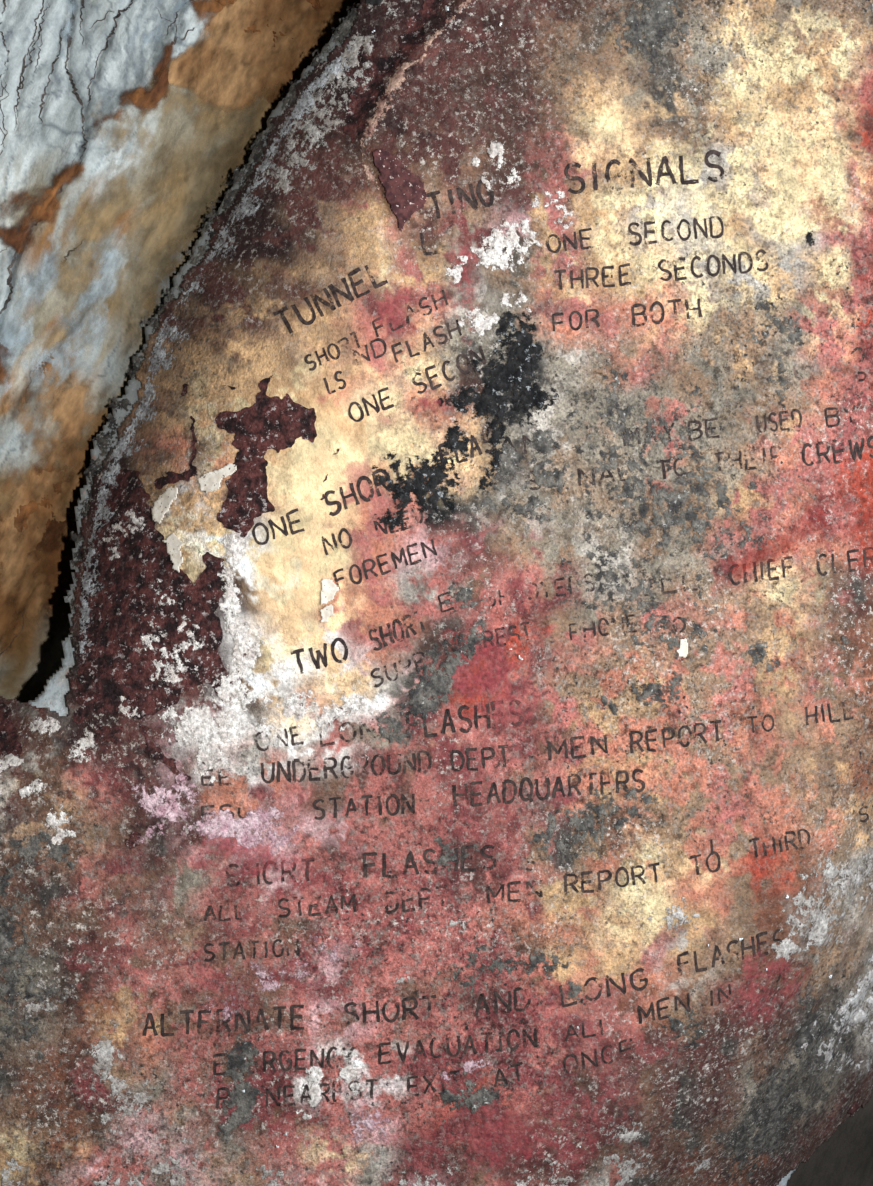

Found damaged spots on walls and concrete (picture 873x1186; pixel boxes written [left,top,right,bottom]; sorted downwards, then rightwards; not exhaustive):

crack [0,221,40,314]
rust [0,162,84,253]
crack [0,0,194,197]
rust [95,0,358,312]
crack [18,350,51,412]
damp [744,283,803,410]
rust [0,305,101,651]
damp [372,311,768,707]
peeling [72,375,317,782]
damp [748,639,780,672]
peeling [0,701,22,758]
peeling [125,831,141,849]